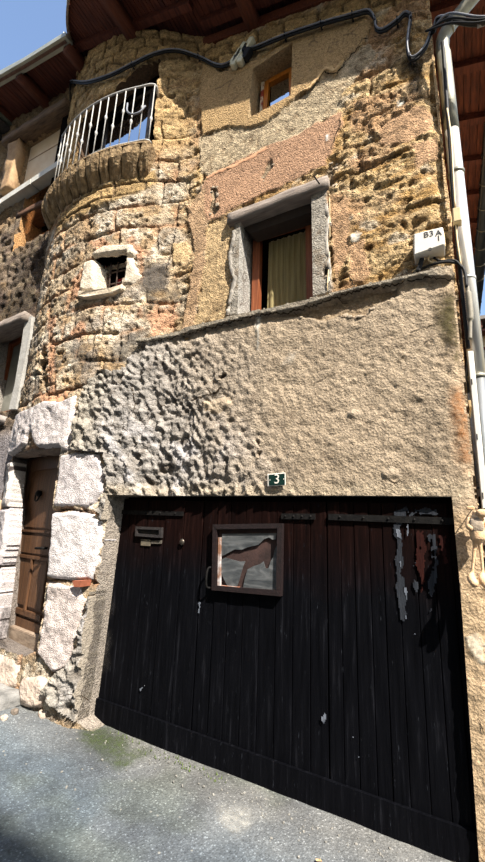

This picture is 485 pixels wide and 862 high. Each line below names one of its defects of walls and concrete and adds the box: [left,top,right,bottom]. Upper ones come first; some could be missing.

peeling [304,59,344,91]
damp [439,294,458,360]
crack [97,374,141,430]
crack [160,387,230,407]
peeling [393,506,448,621]